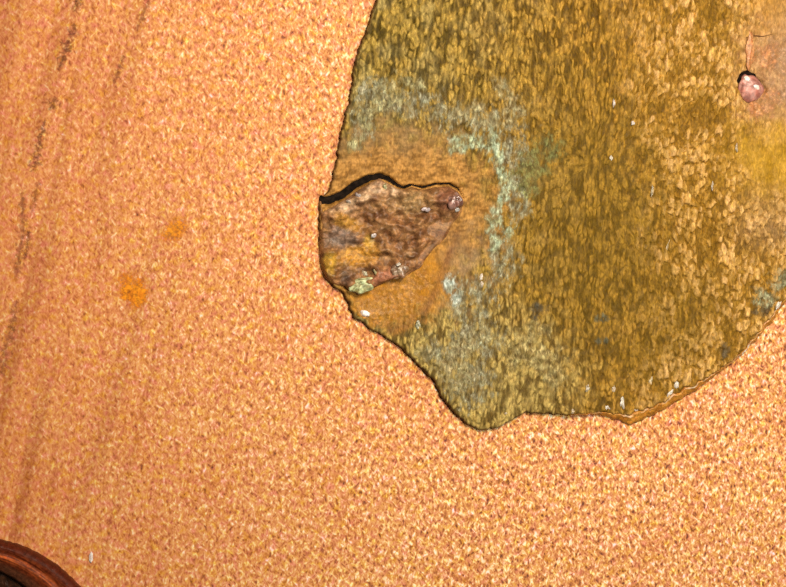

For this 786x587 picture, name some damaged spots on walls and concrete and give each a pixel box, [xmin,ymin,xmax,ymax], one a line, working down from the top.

crack [319,173,462,205]